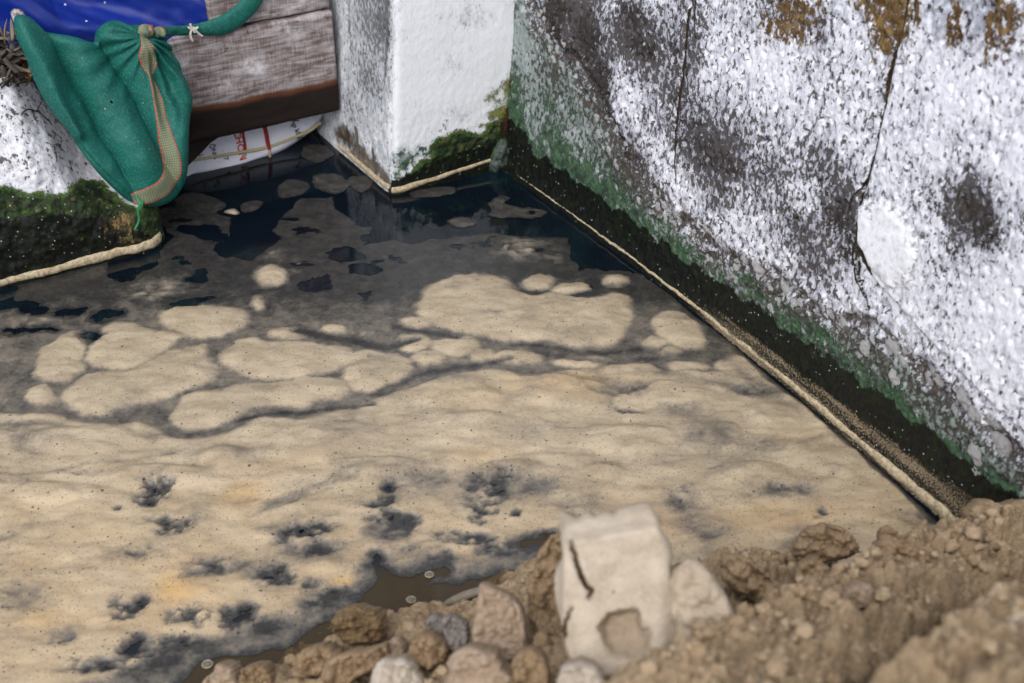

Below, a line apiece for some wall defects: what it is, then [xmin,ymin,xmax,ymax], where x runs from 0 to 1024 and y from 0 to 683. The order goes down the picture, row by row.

crack [669,0,697,185]
damp [677,95,773,191]
rust [756,0,837,63]
crack [847,0,917,297]
rust [848,0,1024,119]
damp [0,209,163,290]
damp [335,118,1018,523]